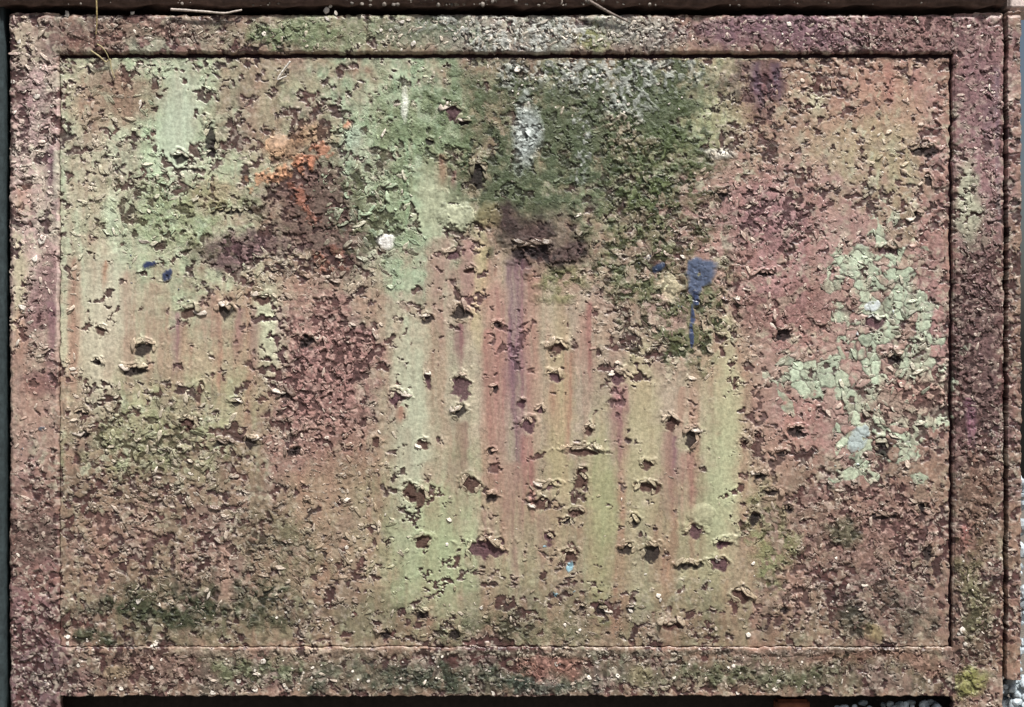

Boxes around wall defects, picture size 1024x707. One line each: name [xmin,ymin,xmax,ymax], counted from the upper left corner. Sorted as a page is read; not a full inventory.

peeling [8,15,233,389]
rust [100,110,416,514]
peeling [64,112,528,639]
peeling [11,391,927,707]
rust [422,197,632,599]
peeling [420,64,946,643]
rust [659,15,1002,681]